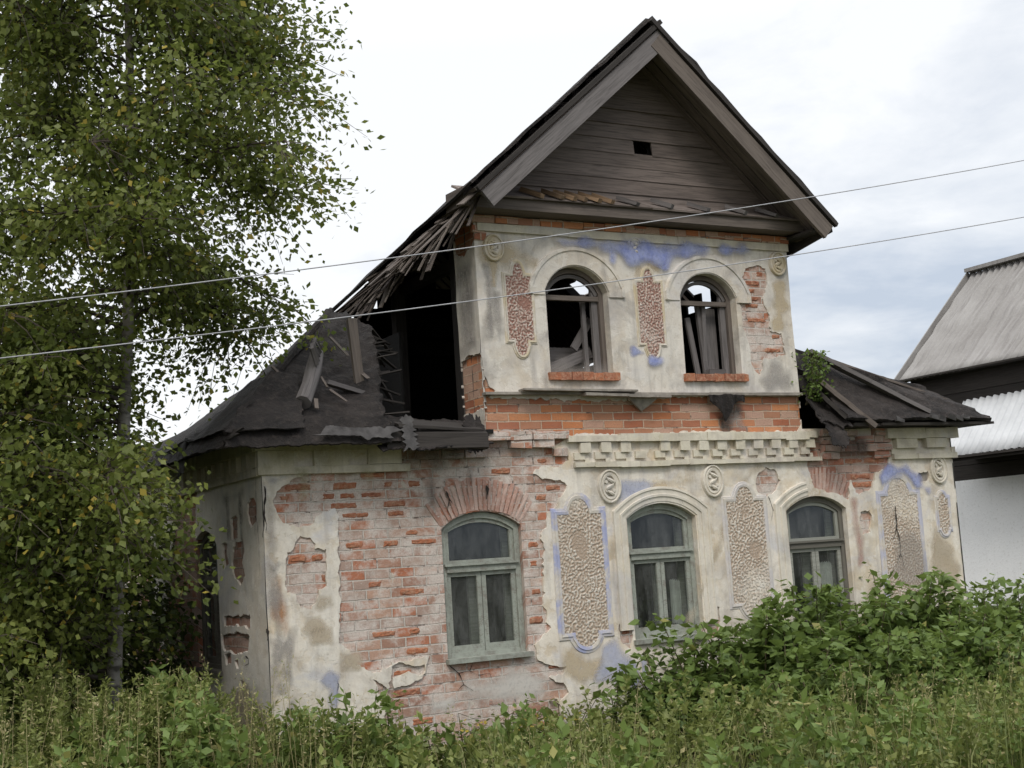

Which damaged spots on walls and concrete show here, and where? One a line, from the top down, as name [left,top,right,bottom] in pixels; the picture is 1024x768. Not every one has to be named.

spalling [739,265,785,374]
spalling [806,428,893,499]
spalling [141,493,257,691]
spalling [273,354,800,755]
crack [893,506,905,568]